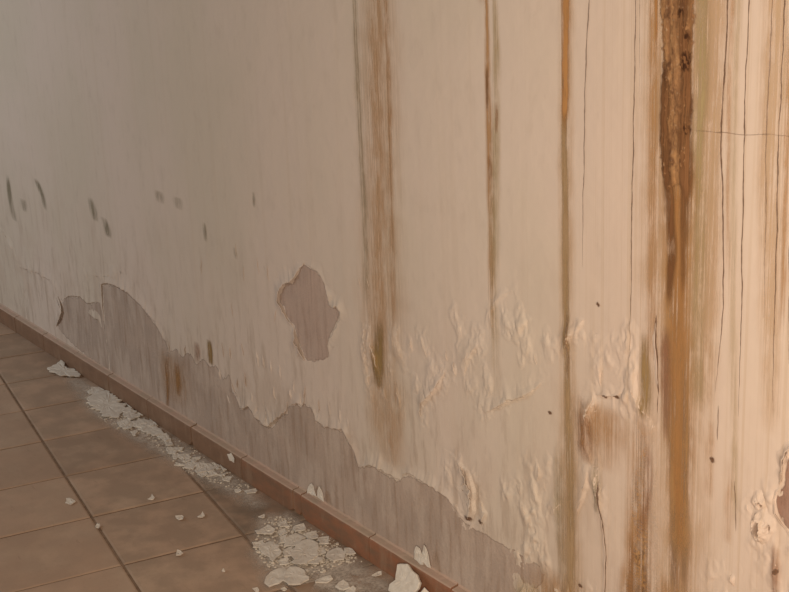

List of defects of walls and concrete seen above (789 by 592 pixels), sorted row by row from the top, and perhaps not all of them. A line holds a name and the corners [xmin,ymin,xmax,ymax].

rust [557,0,612,592]
leakage [373,329,383,385]
peeling [51,257,544,592]
crack [596,485,606,592]
peeling [772,441,789,539]